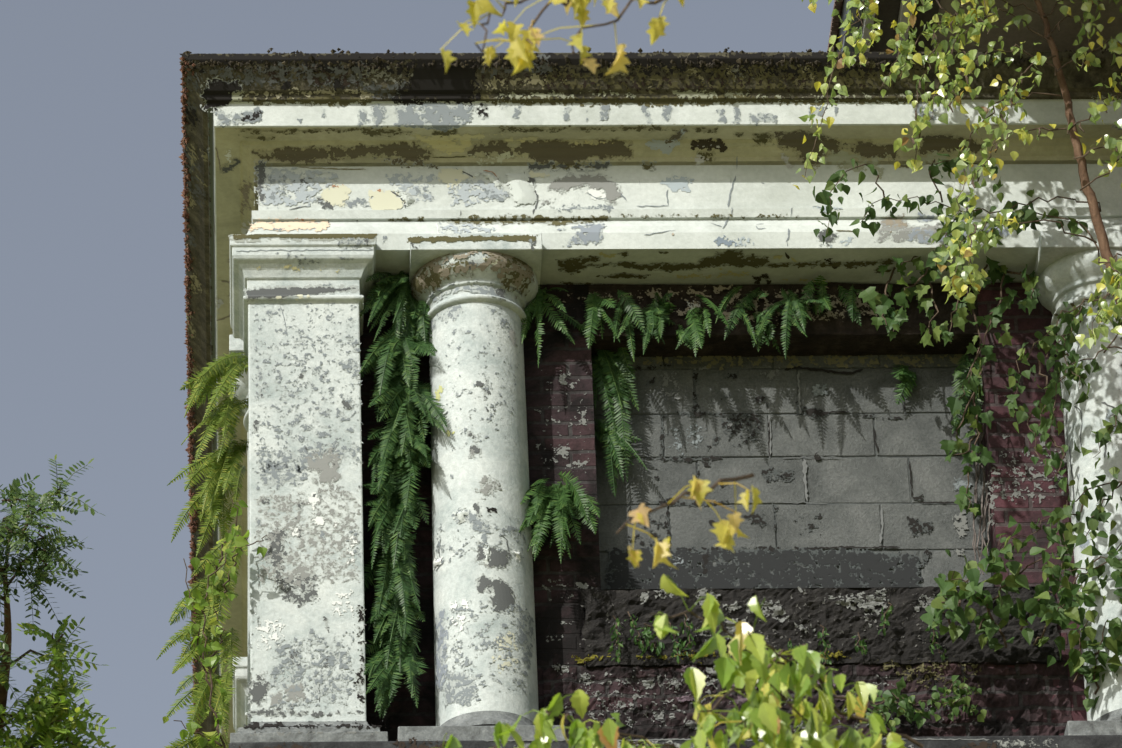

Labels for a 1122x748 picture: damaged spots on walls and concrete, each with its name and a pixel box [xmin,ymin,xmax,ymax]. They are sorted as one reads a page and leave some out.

peeling [495,90,636,101]
peeling [673,90,872,101]
spalling [914,134,984,157]
peeling [219,127,901,279]
leakage [180,52,942,363]
spalling [874,212,967,245]
leakage [407,187,818,459]
leakage [243,283,364,648]
leakage [436,475,526,571]
spalling [449,540,521,631]
leakage [604,482,934,589]
leakage [244,604,386,748]